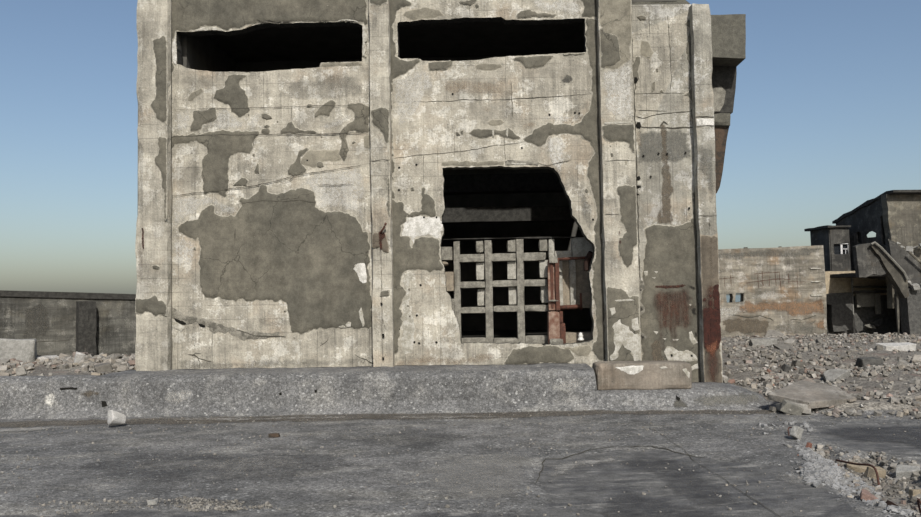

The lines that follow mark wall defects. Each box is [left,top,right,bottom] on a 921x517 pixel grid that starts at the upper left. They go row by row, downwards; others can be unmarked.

crack [414,85,585,115]
flaking render [150,0,453,360]
flaking render [456,0,822,383]
water stain [639,125,690,224]
flaking render [135,294,167,318]
rust [655,284,689,333]
rust [703,284,721,381]